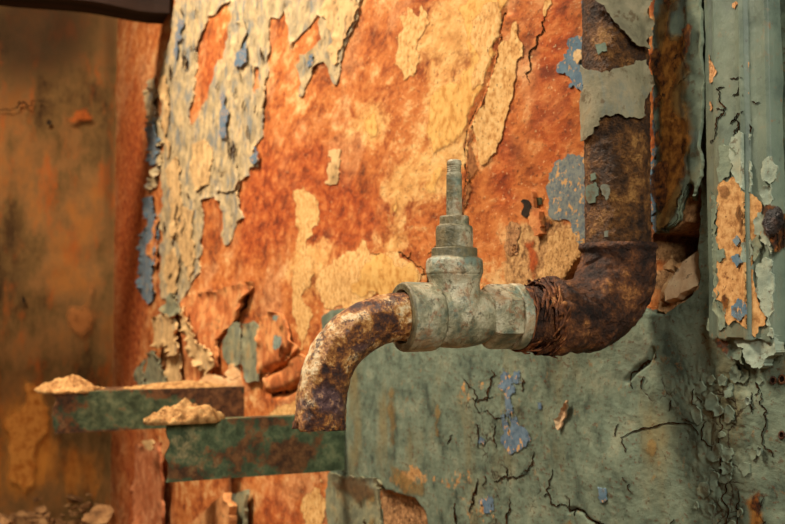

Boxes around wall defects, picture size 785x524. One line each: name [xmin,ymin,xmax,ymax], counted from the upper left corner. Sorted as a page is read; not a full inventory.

crack [462,12,507,213]
crack [525,16,545,83]
peeling [556,0,717,234]
rust [649,0,692,230]
peeling [133,0,421,392]
peeling [504,154,585,282]
peeling [707,130,785,369]
flaking render [270,401,296,415]
crack [453,451,534,524]
crack [614,389,740,524]
rust [748,492,761,524]
crack [750,382,773,457]